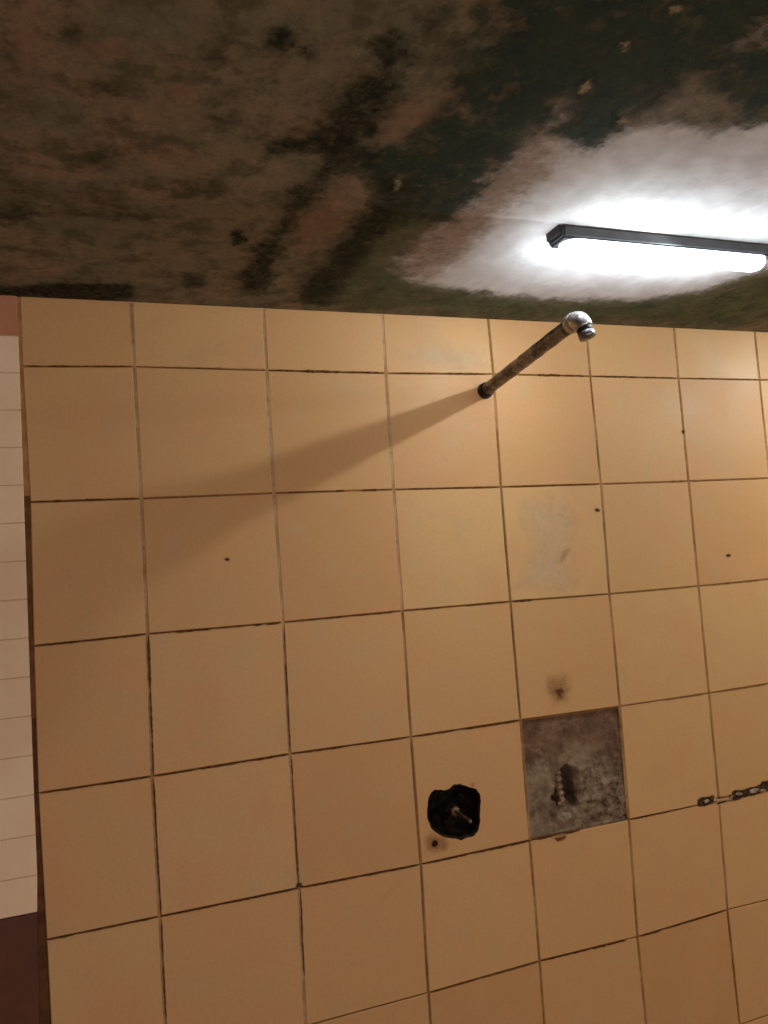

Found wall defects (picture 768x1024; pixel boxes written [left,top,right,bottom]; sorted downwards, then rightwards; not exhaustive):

leakage [231,0,768,306]
leakage [0,283,134,300]
spalling [427,784,481,840]
peeling [522,707,627,840]